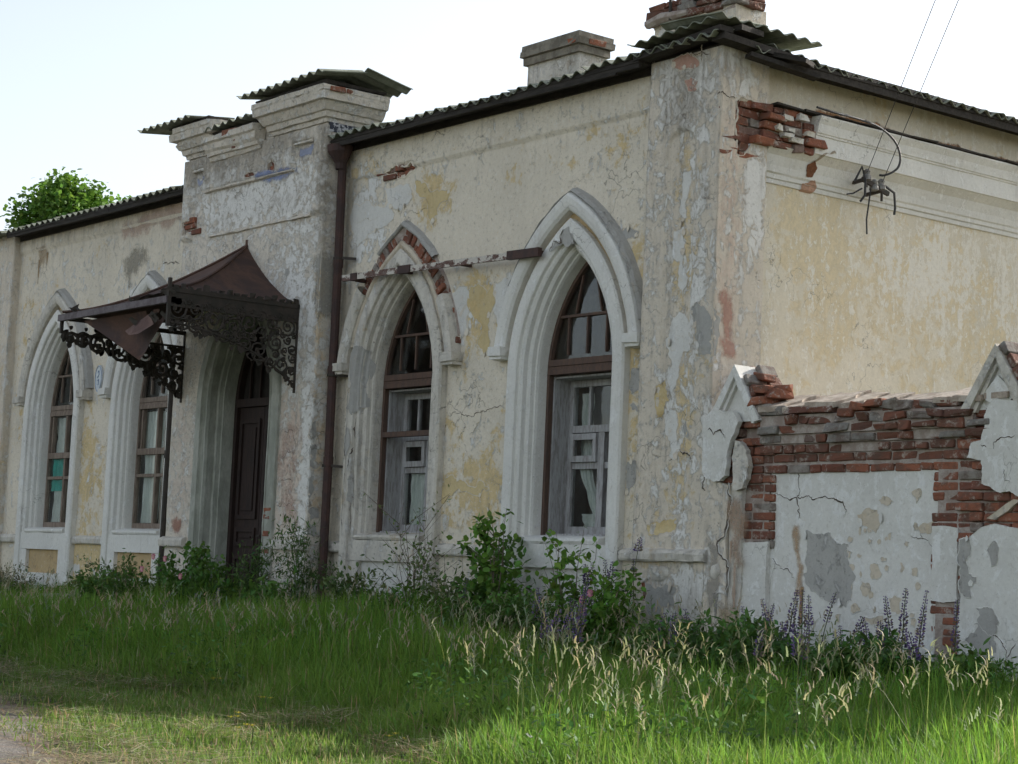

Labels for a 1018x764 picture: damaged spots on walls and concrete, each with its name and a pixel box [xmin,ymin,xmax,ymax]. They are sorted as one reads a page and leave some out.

flaking render [719,96,828,158]
flaking render [181,217,201,236]
flaking render [350,161,513,357]
peeling [672,170,693,296]
crack [448,405,505,441]
spalling [653,301,721,461]
crack [669,449,732,594]
crack [774,473,848,519]
spalling [803,495,935,648]
spalling [956,535,1000,659]